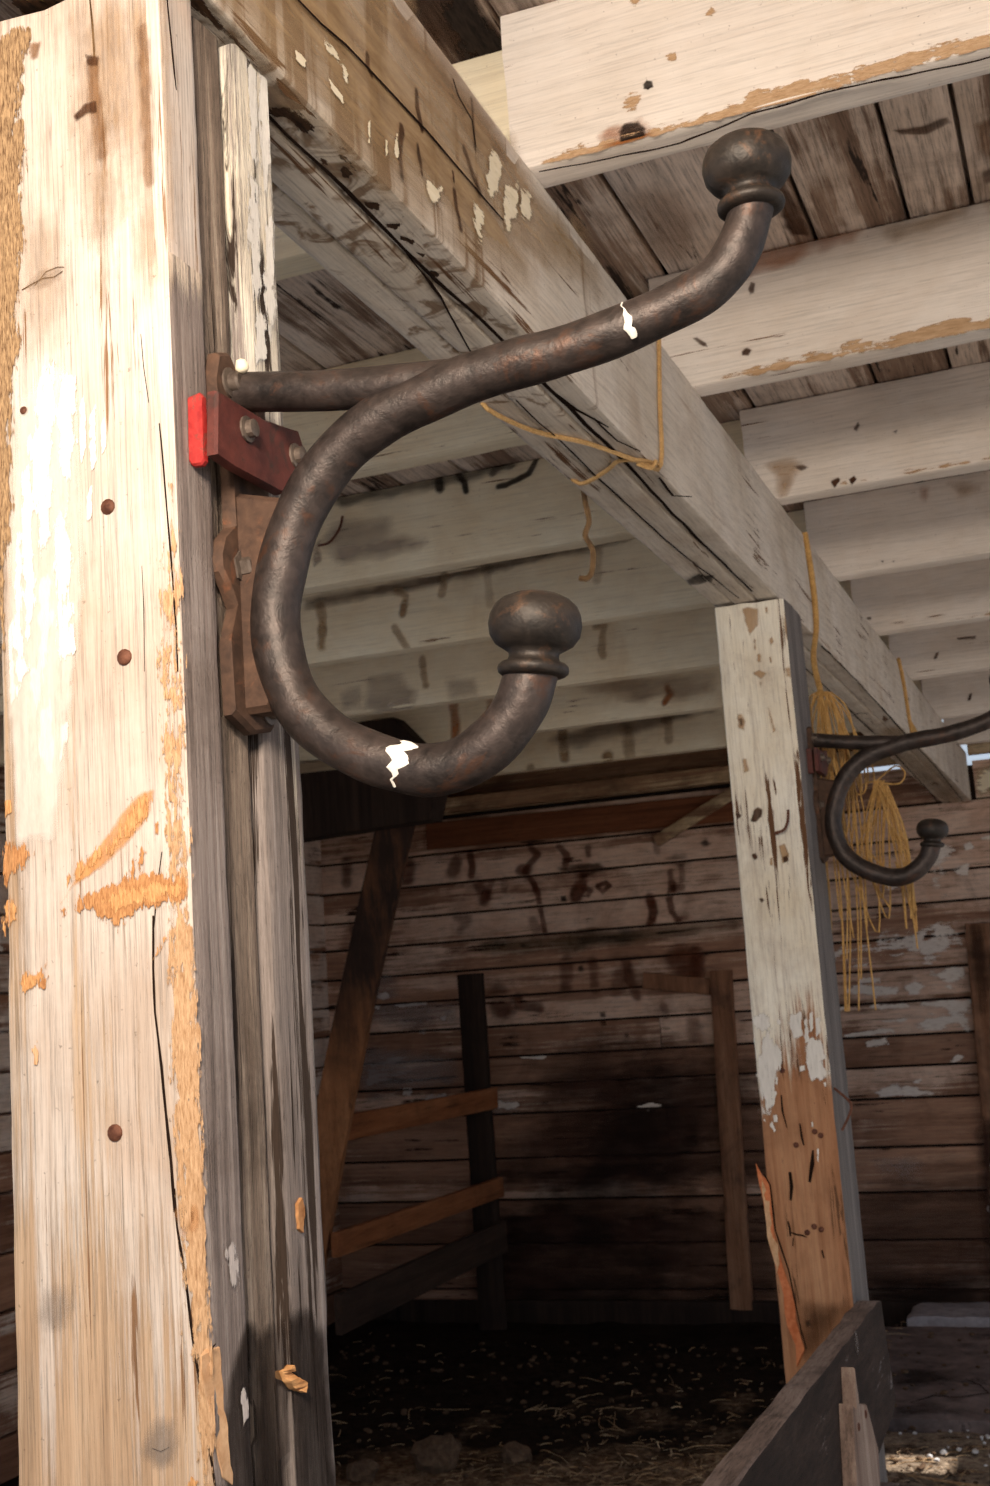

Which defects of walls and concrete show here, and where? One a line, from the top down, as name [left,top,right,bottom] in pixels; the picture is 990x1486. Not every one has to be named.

peeling [324,38,348,103]
peeling [368,120,399,158]
peeling [426,180,443,203]
peeling [473,150,532,245]
peeling [539,34,990,172]
peeling [722,317,990,379]
peeling [8,358,106,837]
spalling [61,792,187,933]
peeling [834,922,972,1047]
peeling [753,1011,830,1133]
crack [152,909,216,1385]
crack [208,1448,216,1486]